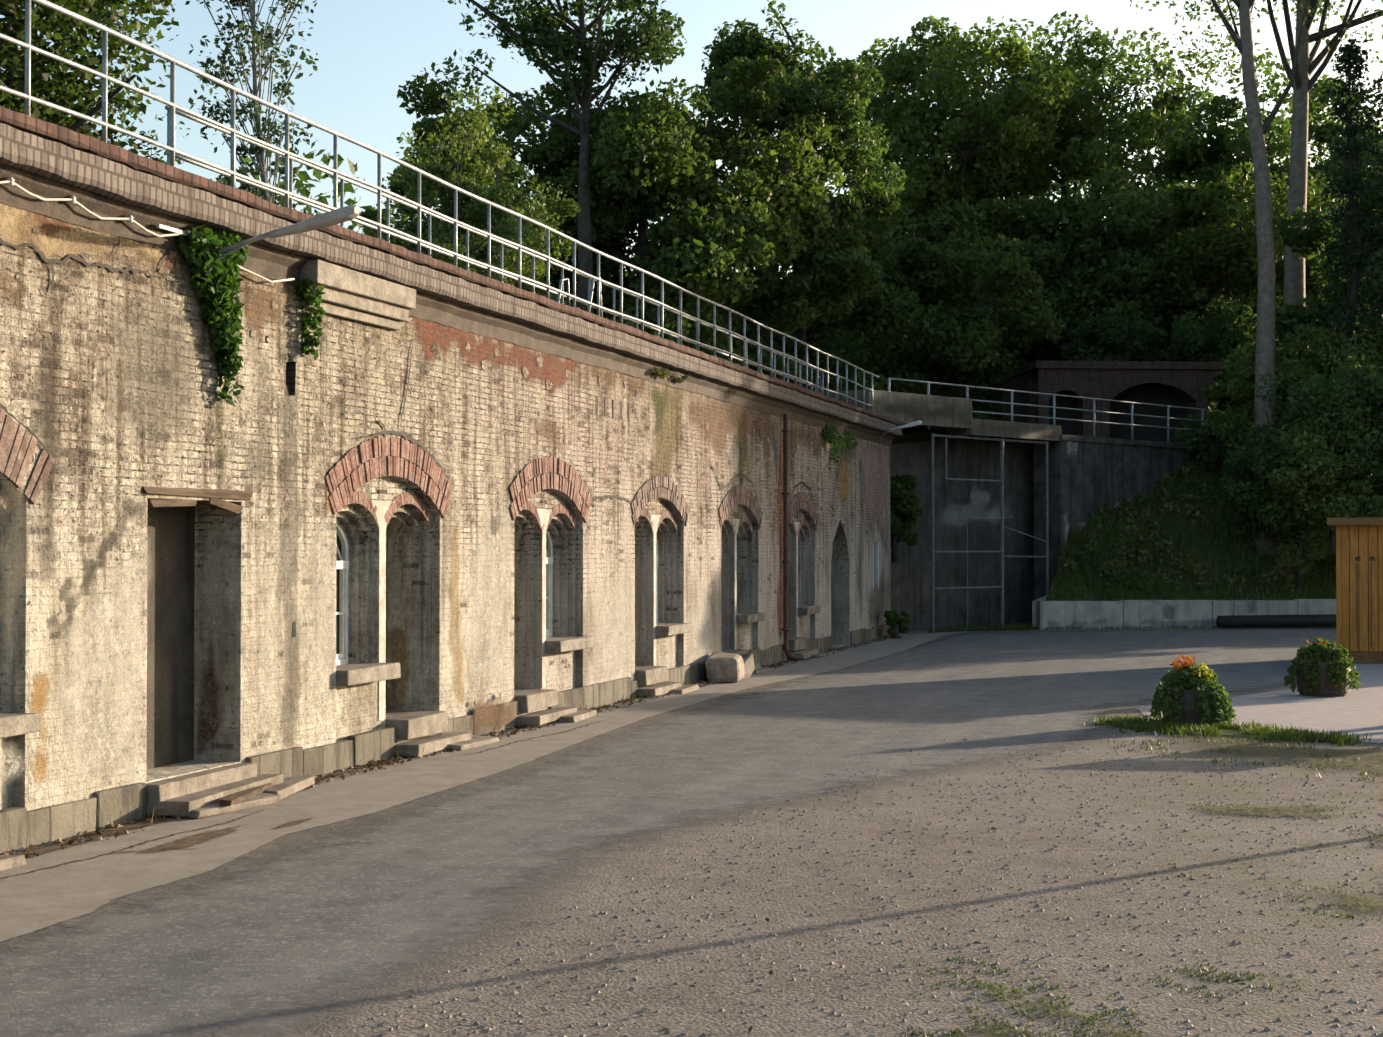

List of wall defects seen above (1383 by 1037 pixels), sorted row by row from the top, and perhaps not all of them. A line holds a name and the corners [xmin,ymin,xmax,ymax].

peeling [0,203,178,274]
crack [0,234,185,293]
peeling [414,317,645,398]
rust [32,676,49,779]